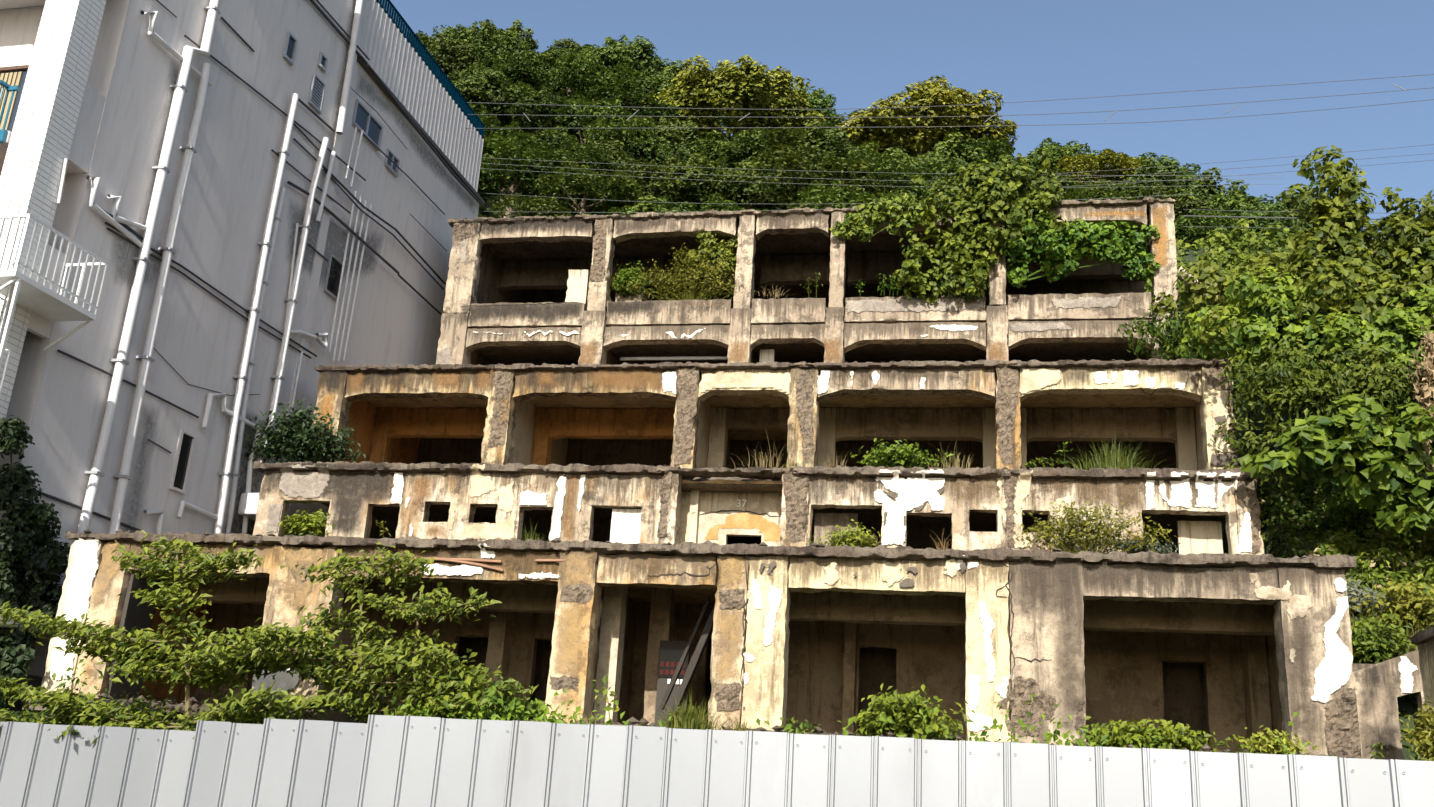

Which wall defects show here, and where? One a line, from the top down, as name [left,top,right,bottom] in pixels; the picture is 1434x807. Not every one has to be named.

peeling [407,365,593,604]
spalling [549,675,579,692]
spalling [656,362,830,542]
spalling [714,561,782,711]
peeling [823,561,857,585]
peeling [874,469,945,587]
peeling [943,555,979,577]
spalling [967,601,1058,737]
peeling [1145,358,1262,554]
spalling [1249,573,1313,619]
peeling [1311,577,1362,758]